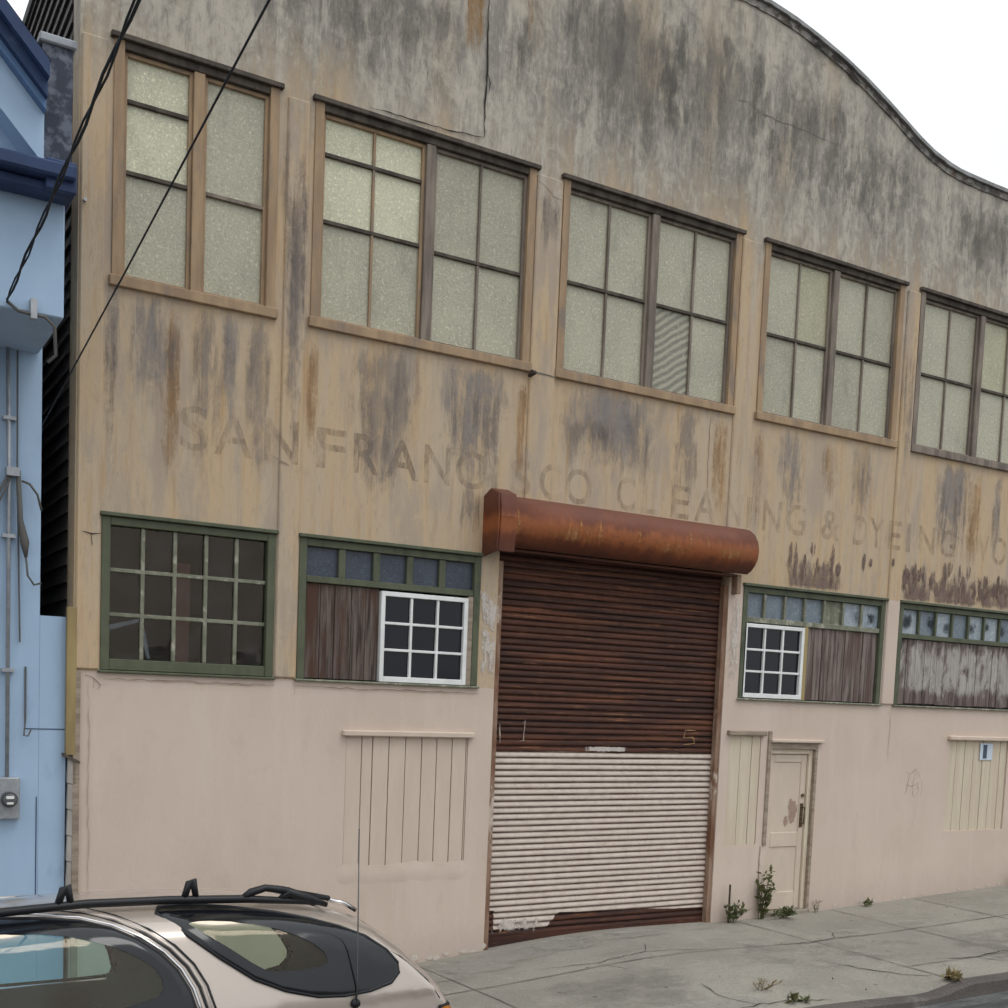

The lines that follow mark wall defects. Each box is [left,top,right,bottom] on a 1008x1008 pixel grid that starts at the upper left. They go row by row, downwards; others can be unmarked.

crack [371,0,491,137]
water stain [288,227,304,374]
peeling [788,543,841,590]
peeling [892,559,1008,608]